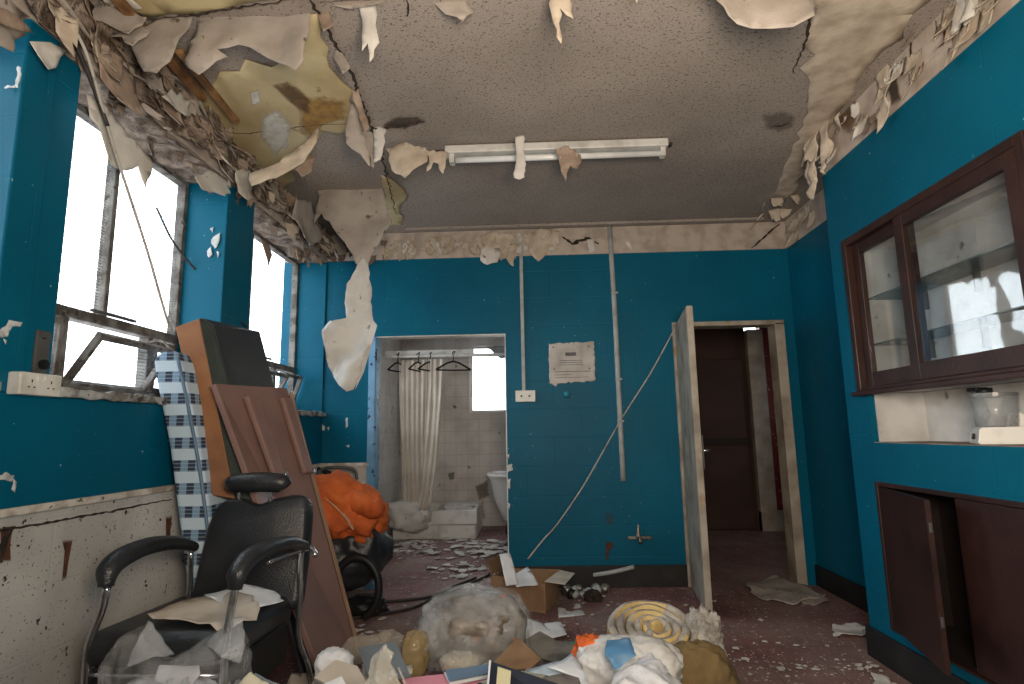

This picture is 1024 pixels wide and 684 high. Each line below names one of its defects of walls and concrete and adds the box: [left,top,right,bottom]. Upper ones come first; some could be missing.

water stain [276,84,344,135]
peeling [750,0,999,248]
spalling [0,0,599,392]
spalling [0,472,17,493]
corrosion [0,526,16,563]
corrosion [62,541,72,578]